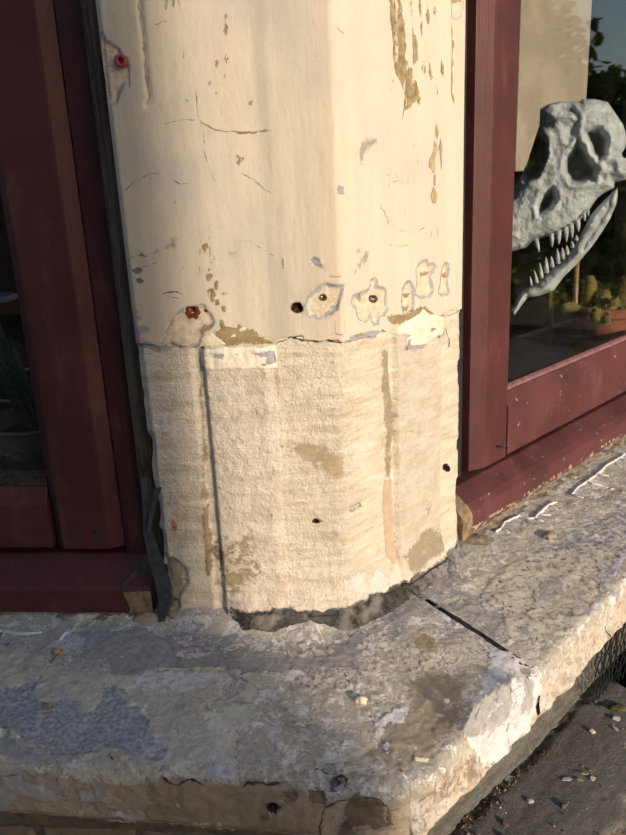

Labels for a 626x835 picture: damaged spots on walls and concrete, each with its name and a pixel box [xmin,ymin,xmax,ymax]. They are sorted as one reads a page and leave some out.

spalling [101,31,130,106]
peeling [389,0,444,115]
crack [167,90,271,179]
corrosion [185,306,200,320]
flaking render [132,238,460,617]
peeling [252,643,336,658]
peeling [463,530,626,768]
peeling [0,643,268,812]
peeling [371,706,409,758]
peeling [186,756,392,804]
peeling [95,811,235,831]